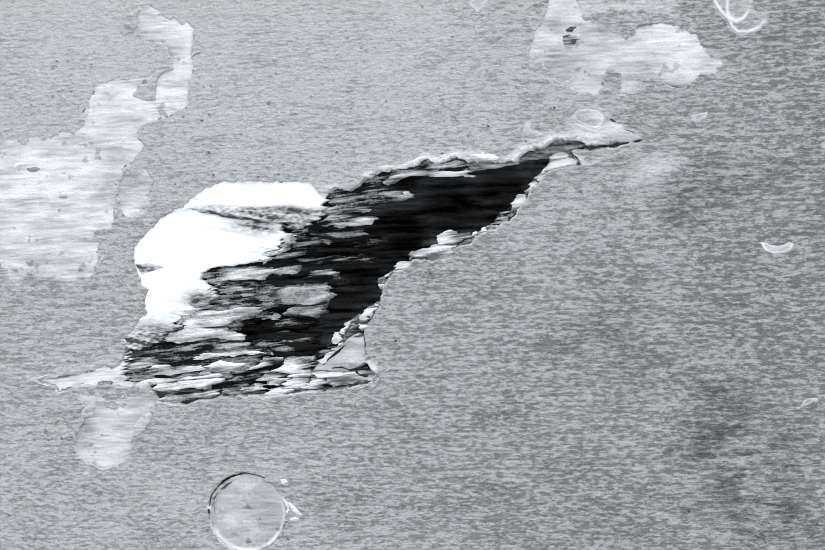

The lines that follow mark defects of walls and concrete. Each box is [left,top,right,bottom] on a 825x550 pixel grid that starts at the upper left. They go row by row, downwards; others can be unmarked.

peeling [0,6,199,283]
spalling [233,120,581,392]
peeling [529,0,727,94]
peeling [65,322,185,468]